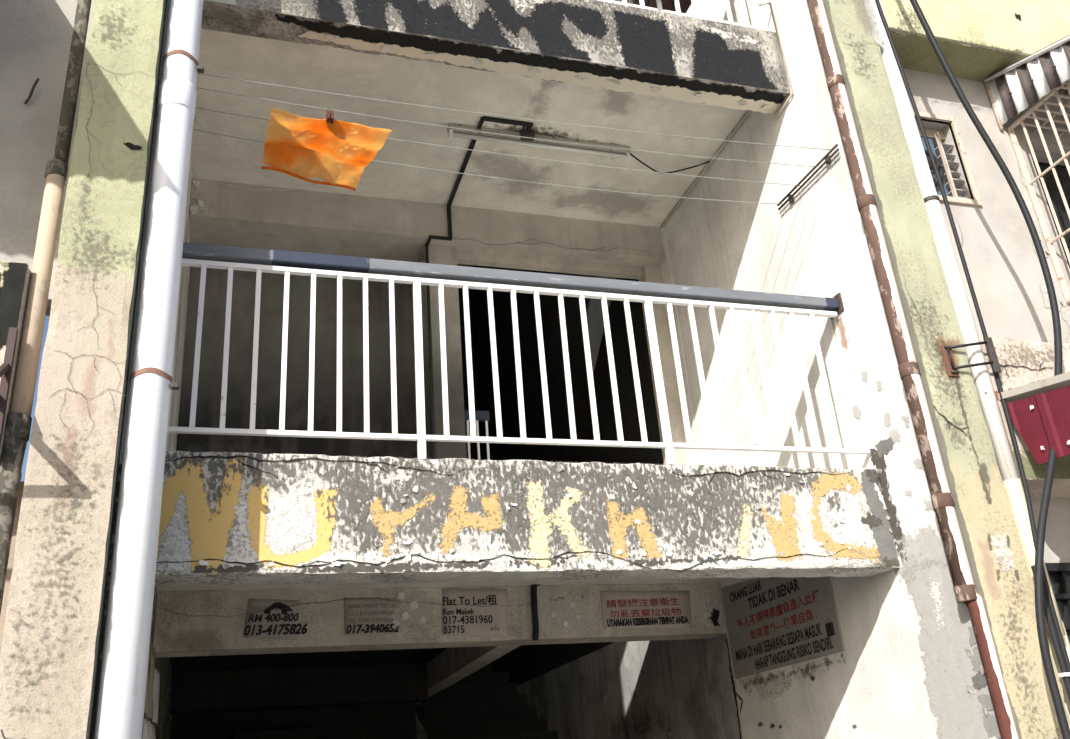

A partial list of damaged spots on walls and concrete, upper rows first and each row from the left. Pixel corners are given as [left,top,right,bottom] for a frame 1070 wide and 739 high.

peeling [701,26,759,45]
leakage [7,0,167,739]
peeling [359,465,419,504]
spalling [846,412,948,582]
spalling [193,560,275,573]
spalling [300,541,566,572]
spalling [600,540,747,567]